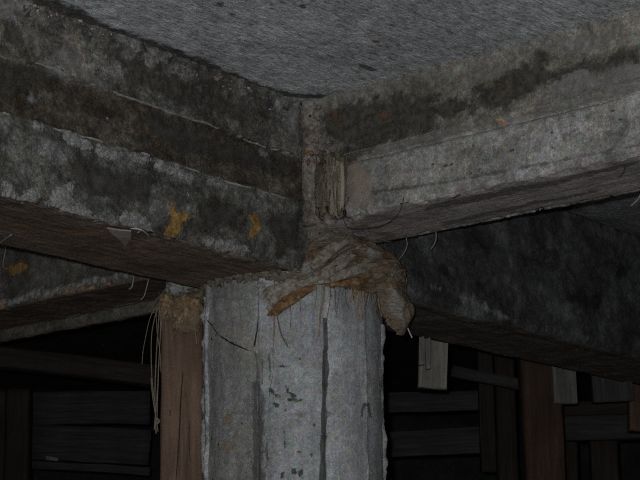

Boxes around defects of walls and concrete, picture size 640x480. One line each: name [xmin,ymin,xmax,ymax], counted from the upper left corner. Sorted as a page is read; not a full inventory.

damp [0,0,326,120]
damp [321,30,639,163]
rust [164,197,190,239]
crack [204,303,259,351]